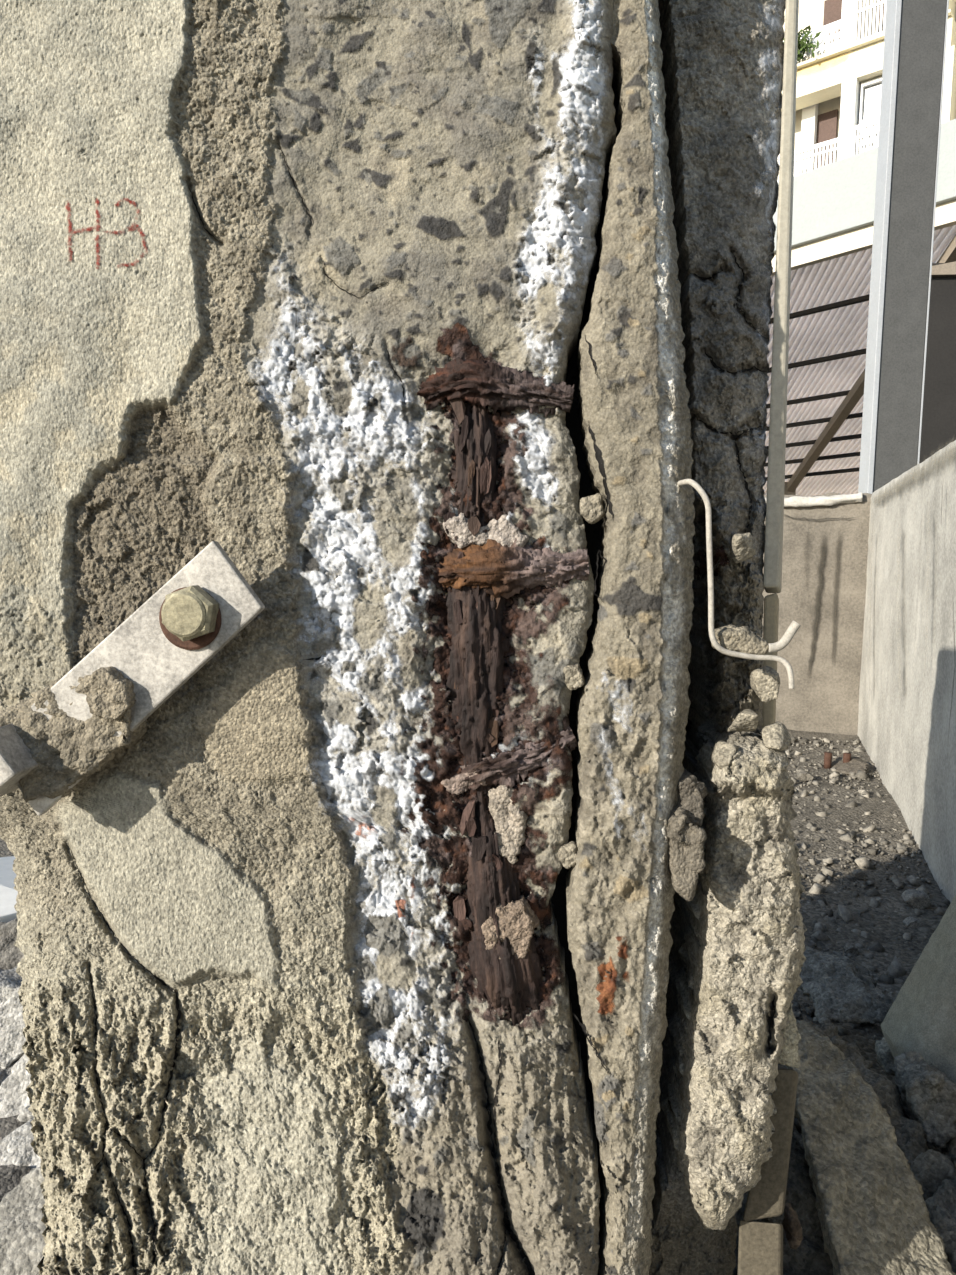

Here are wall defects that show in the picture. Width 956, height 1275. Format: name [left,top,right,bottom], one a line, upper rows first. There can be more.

spalling [0,0,617,1275]
water stain [256,267,454,1129]
corrosion [436,322,501,366]
corrosion [395,395,572,1028]
water stain [491,736,523,758]
water stain [508,411,558,506]
water stain [516,0,605,387]
crack [551,91,617,1231]
crack [68,845,181,1275]
crack [467,1017,535,1275]
corrosion [596,936,628,1015]
crack [766,996,775,1049]